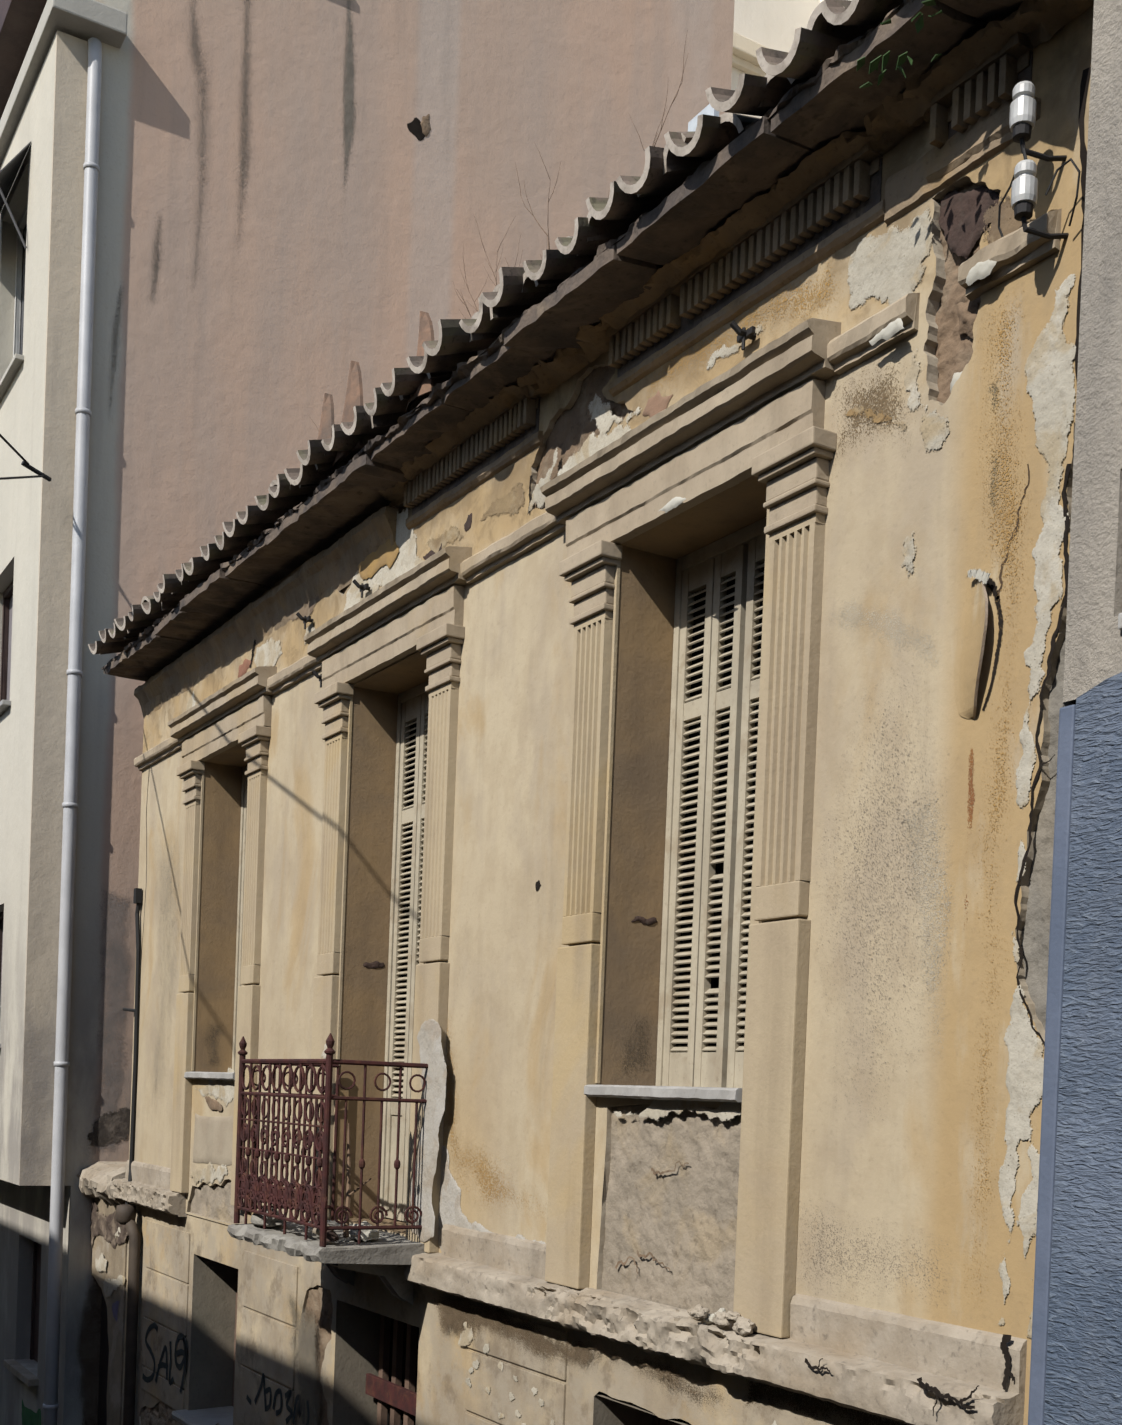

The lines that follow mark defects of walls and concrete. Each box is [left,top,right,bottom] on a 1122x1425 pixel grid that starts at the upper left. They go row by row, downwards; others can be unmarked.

damp [180,0,214,289]
damp [233,0,256,272]
damp [340,0,359,202]
spalling [844,183,1035,432]
crack [1075,67,1091,381]
spalling [341,366,673,611]
crack [997,436,1075,1045]
peeling [997,274,1076,1326]
damp [87,817,185,1159]
peeling [410,1019,493,1249]
spalling [299,1286,333,1425]
crack [917,1334,1014,1416]